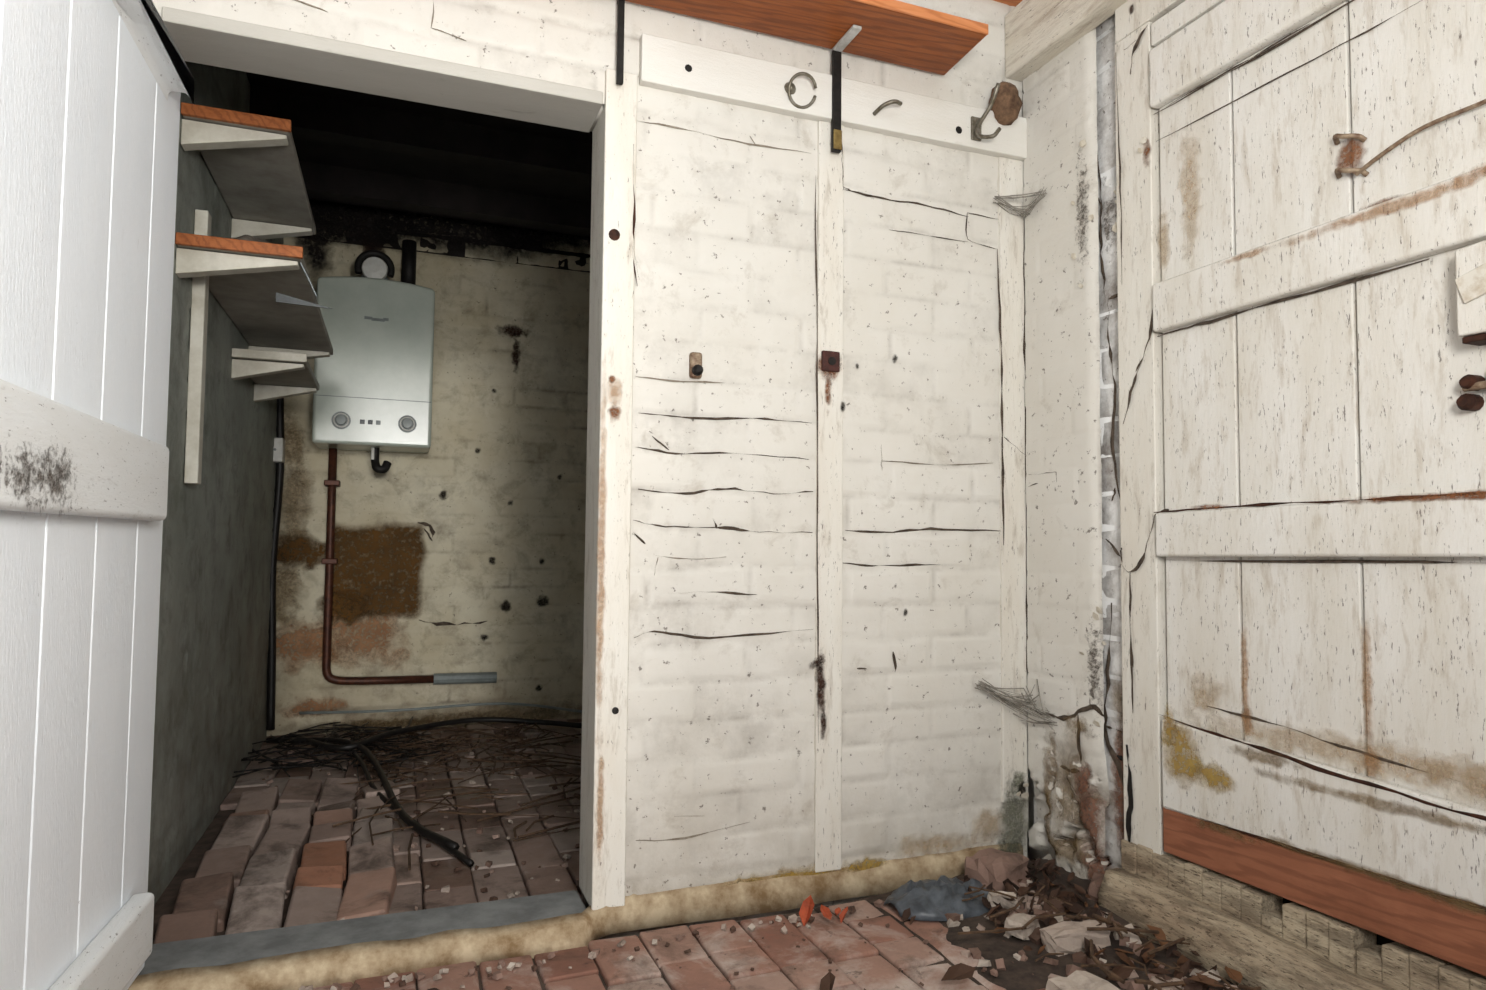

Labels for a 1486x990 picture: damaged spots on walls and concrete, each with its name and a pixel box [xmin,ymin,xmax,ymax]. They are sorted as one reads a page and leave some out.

rust [1338,139,1363,168]
water stain [1163,711,1231,790]
water stain [1239,750,1285,779]
water stain [1299,781,1475,830]